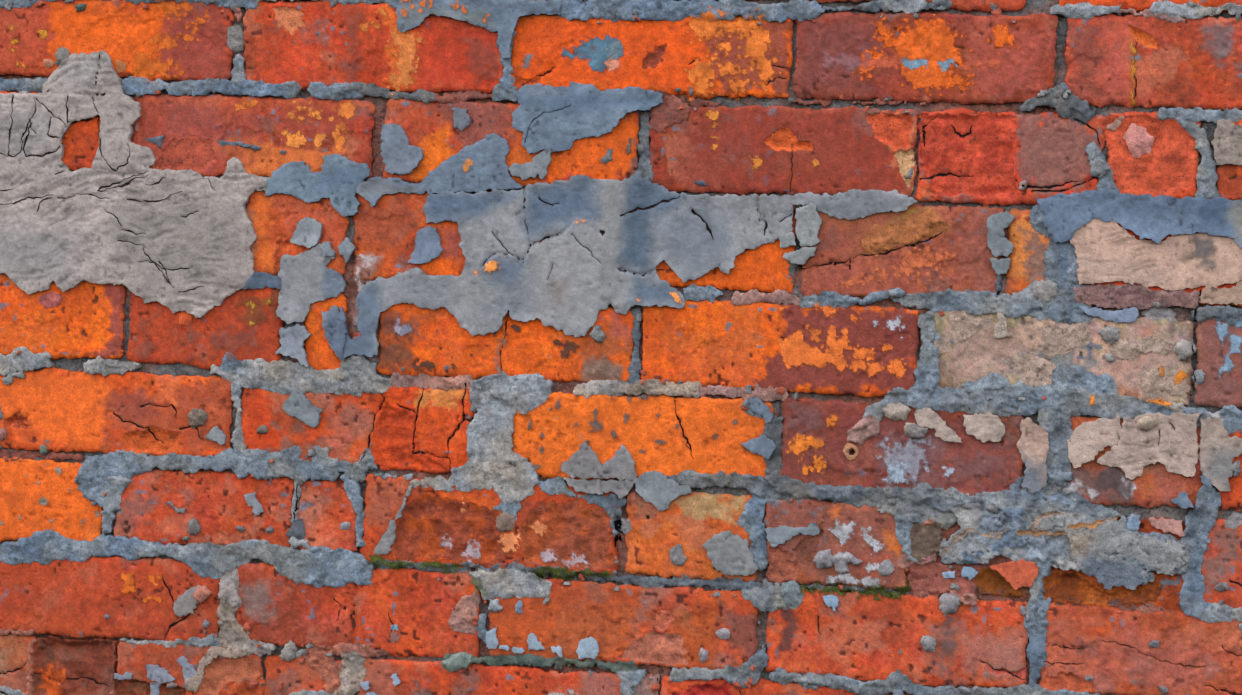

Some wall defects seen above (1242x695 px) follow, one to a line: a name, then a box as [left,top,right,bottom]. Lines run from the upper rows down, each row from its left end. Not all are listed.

crack [0,95,148,192]
flaking render [0,0,1021,367]
crack [482,196,663,280]
crack [620,196,713,238]
crack [757,150,805,235]
flaking render [1037,114,1242,323]
flaking render [962,373,1011,392]
crack [674,396,694,459]
flaking render [904,407,1005,443]
flaking render [907,412,1242,607]
flaking render [823,595,839,611]
crack [980,640,1242,695]